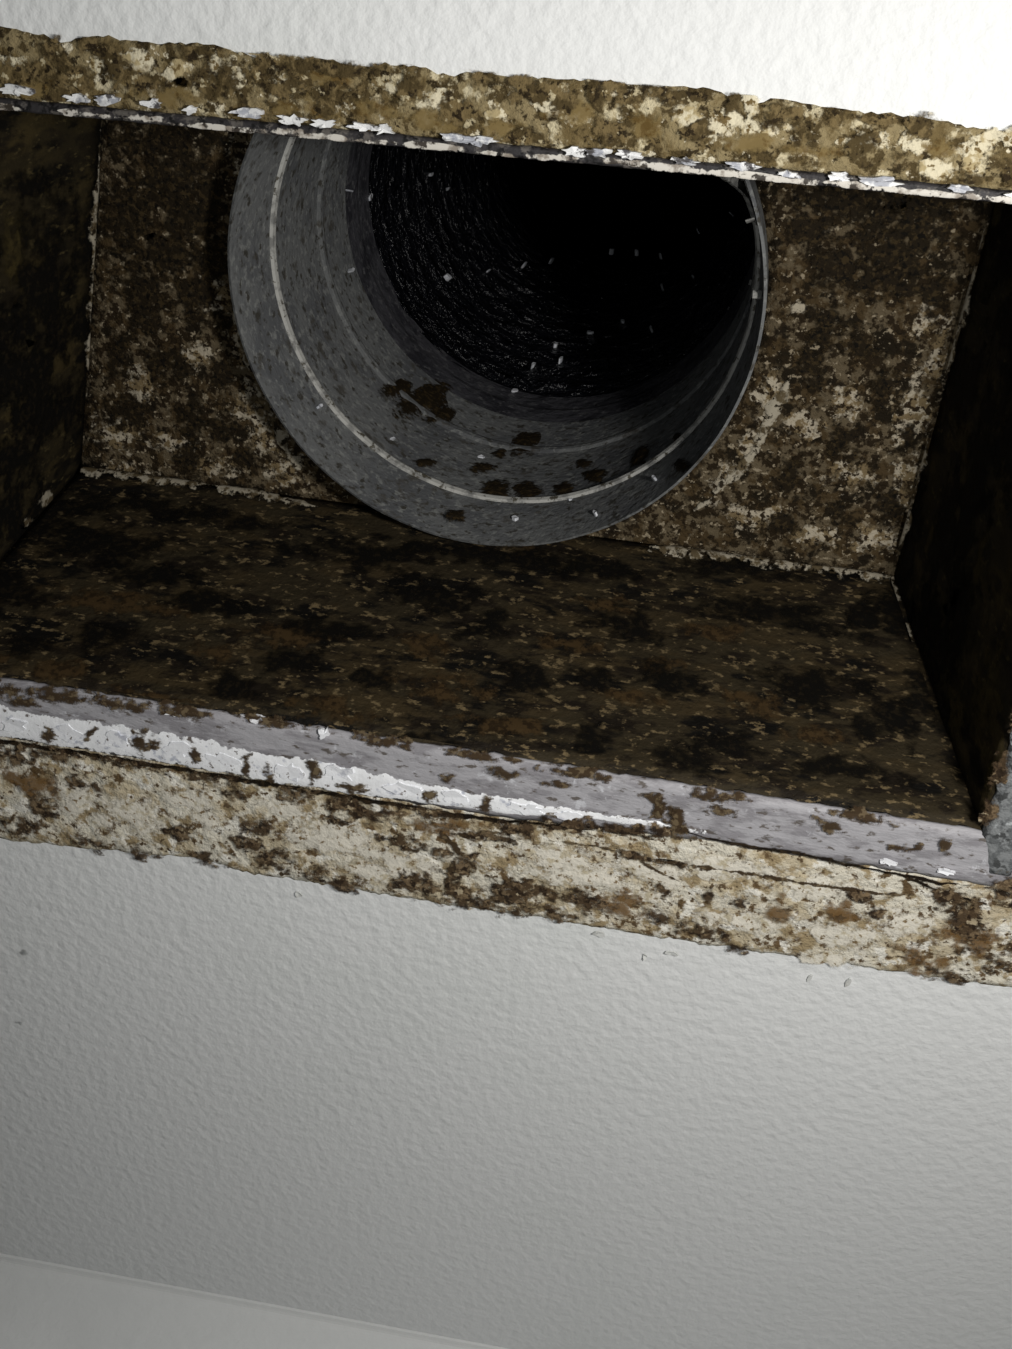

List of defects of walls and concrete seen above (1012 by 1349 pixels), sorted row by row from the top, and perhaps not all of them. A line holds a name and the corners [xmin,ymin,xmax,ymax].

damp [0,34,1012,840]
damp [72,832,162,863]
damp [161,824,230,868]
damp [188,733,765,924]
damp [887,838,952,855]
damp [638,883,749,955]
damp [839,888,894,921]
damp [925,874,1012,986]